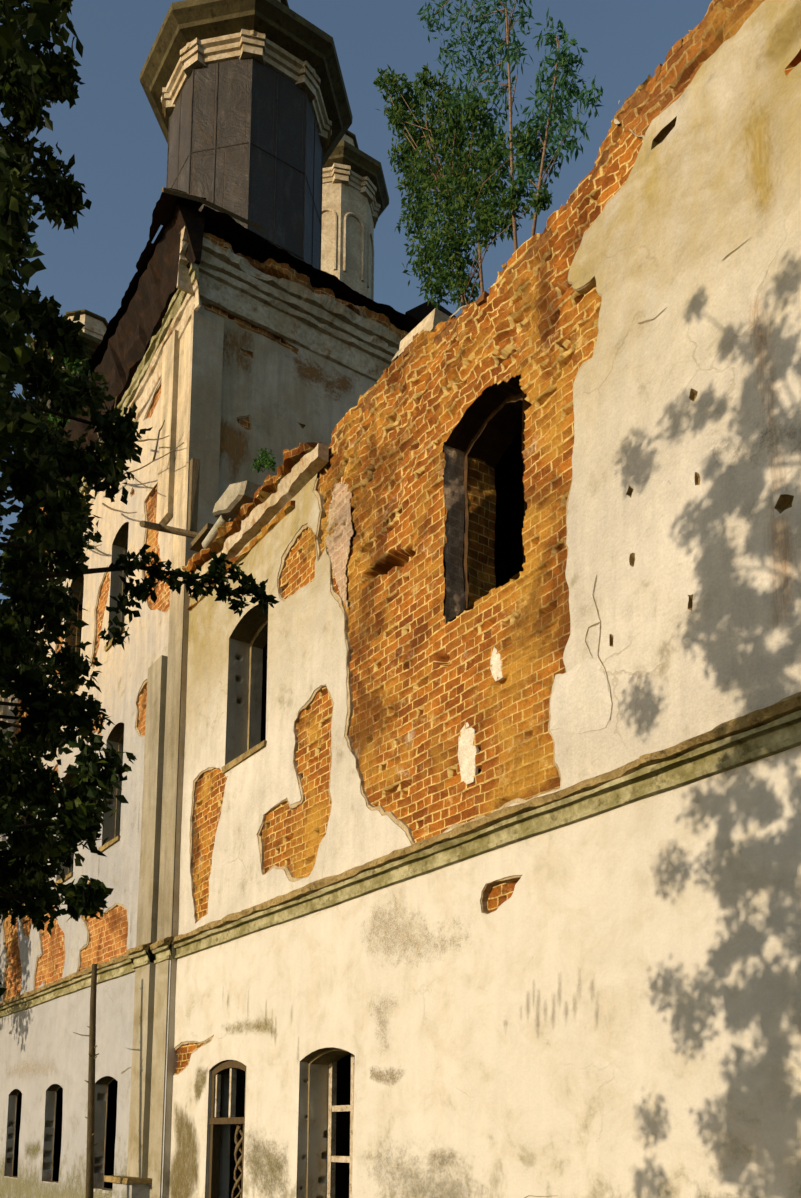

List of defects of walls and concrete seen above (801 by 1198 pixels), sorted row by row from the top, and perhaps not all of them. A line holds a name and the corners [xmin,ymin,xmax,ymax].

spalling [784,49,801,76]
flaking render [130,482,170,613]
flaking render [256,0,765,882]
spalling [774,494,794,514]
crack [585,575,612,718]
flaking render [2,903,128,1002]
flaking render [190,767,228,924]
flaking render [480,875,522,914]